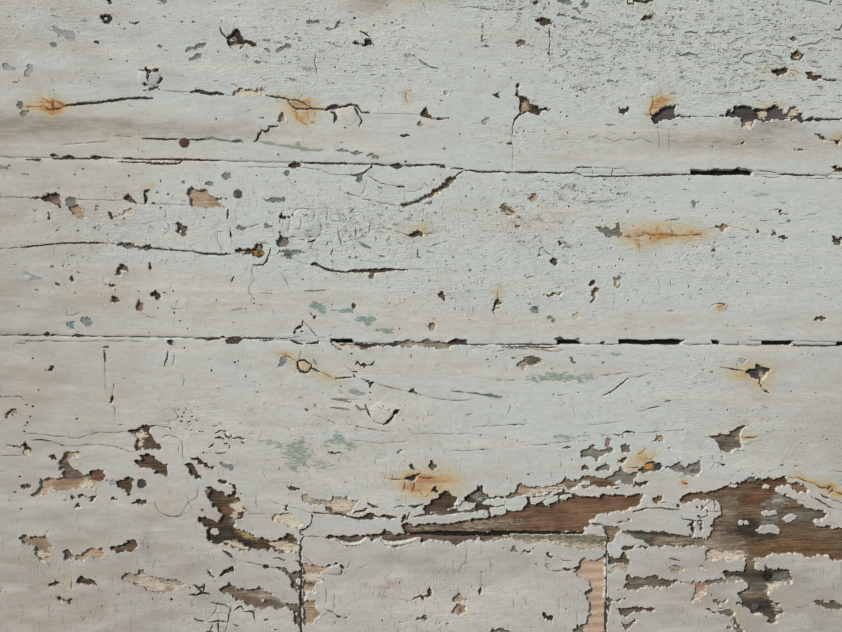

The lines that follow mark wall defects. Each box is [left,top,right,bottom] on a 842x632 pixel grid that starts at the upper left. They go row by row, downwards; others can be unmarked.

corrosion [23,98,67,115]
corrosion [647,96,673,116]
peeling [720,106,819,130]
crack [0,241,115,249]
crack [137,190,257,256]
crack [262,176,449,294]
corrosion [623,219,705,248]
peeling [14,451,147,508]
corrosion [385,469,459,498]
peeling [20,534,53,560]
crack [254,502,476,536]
peeling [334,434,842,632]